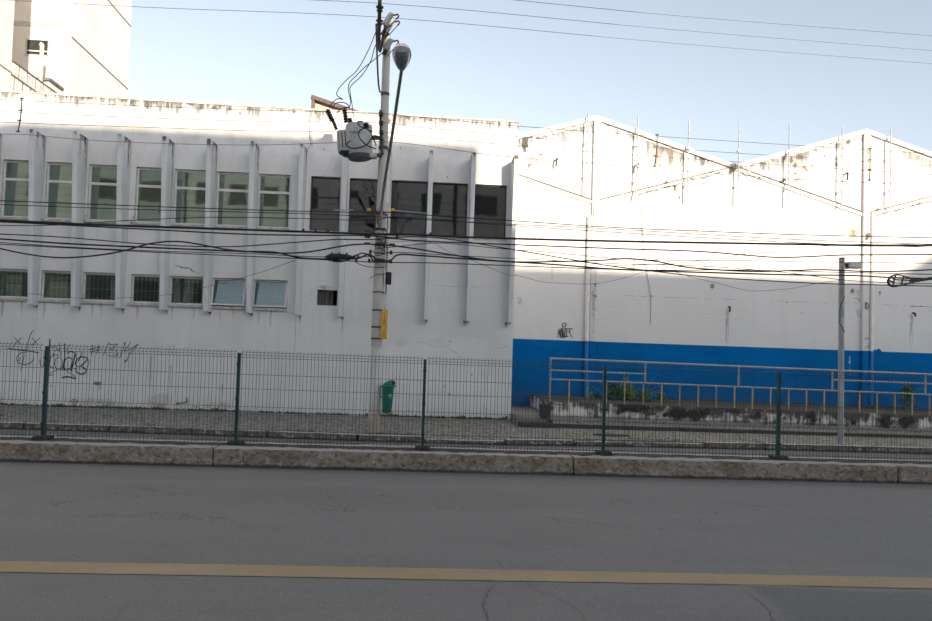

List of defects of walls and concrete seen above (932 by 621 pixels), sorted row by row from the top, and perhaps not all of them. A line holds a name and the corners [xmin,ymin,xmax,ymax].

water stain [388,116,452,125]